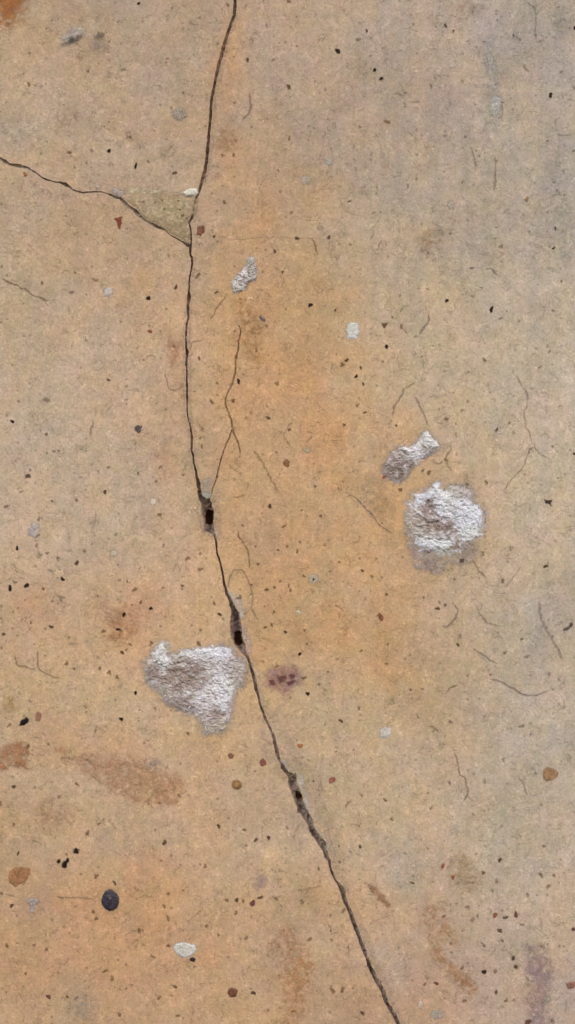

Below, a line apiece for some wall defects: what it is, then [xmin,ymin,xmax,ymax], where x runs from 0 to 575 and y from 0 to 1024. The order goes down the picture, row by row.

crack [0,0,402,1024]